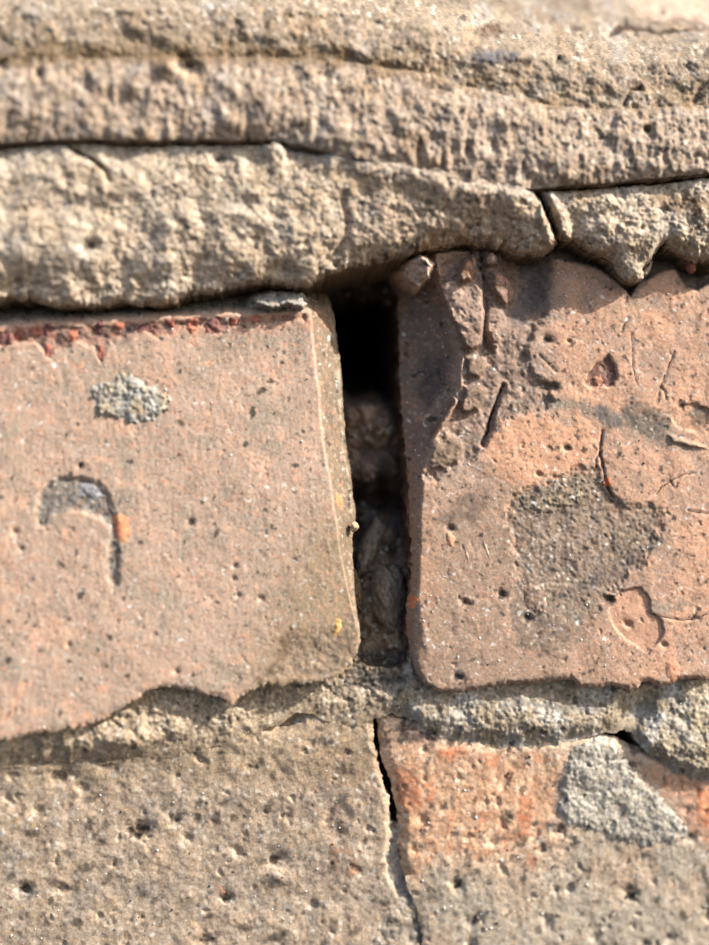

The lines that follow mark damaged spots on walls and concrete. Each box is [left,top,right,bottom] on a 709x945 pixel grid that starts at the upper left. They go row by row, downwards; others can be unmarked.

crack [5,139,310,177]
crack [532,174,709,243]
crack [596,433,613,497]
crack [373,718,396,820]